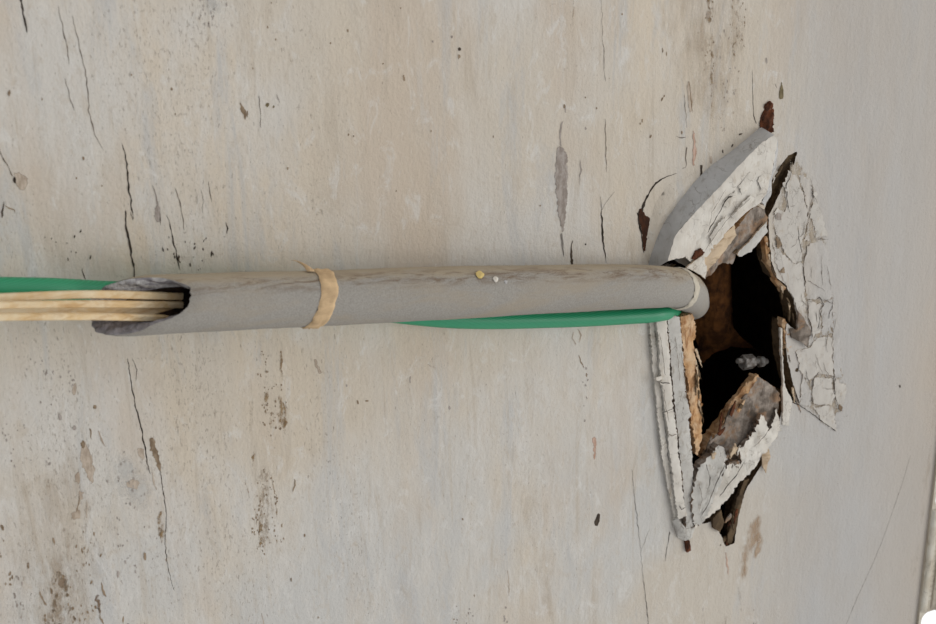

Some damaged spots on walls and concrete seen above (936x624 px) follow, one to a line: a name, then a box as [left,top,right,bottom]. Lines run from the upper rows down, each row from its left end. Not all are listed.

crack [19,0,27,32]
peeling [692,133,712,176]
peeling [662,255,707,279]
peeling [693,163,847,434]
crack [127,359,174,589]